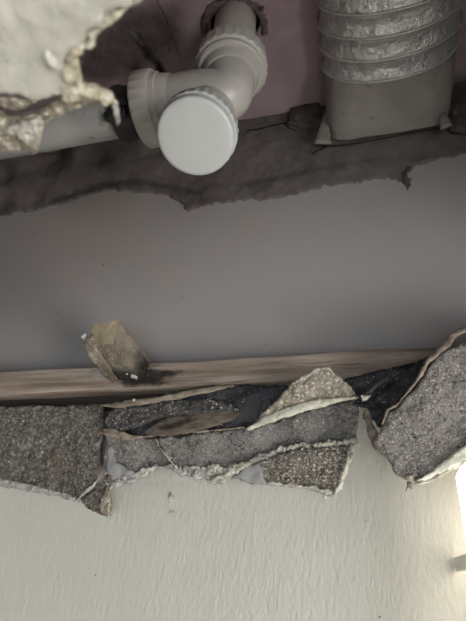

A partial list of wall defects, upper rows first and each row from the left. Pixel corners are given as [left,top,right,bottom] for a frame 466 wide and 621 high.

spalling [201,0,268,36]
spalling [0,0,142,155]
flaking render [245,367,371,431]
spalling [0,435,359,517]
spalling [416,445,466,482]